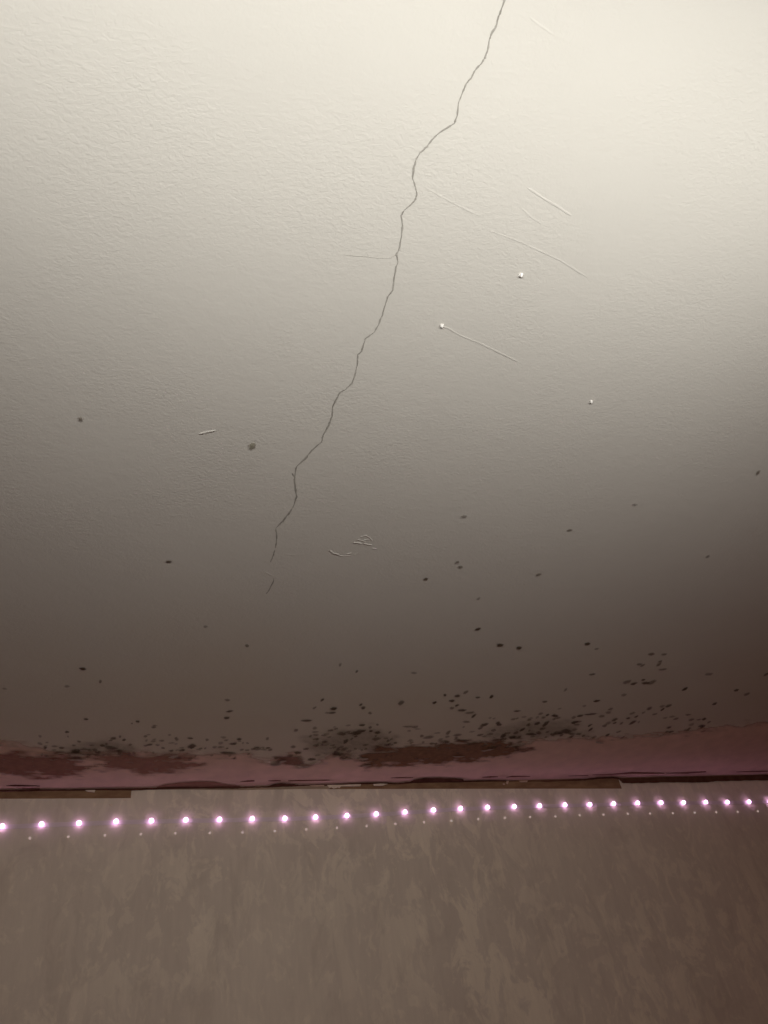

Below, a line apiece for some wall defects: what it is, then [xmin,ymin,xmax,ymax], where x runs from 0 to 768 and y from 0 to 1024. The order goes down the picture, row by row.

crack [266,0,506,594]
leakage [0,738,205,779]
leakage [266,747,315,765]
leakage [333,694,558,767]